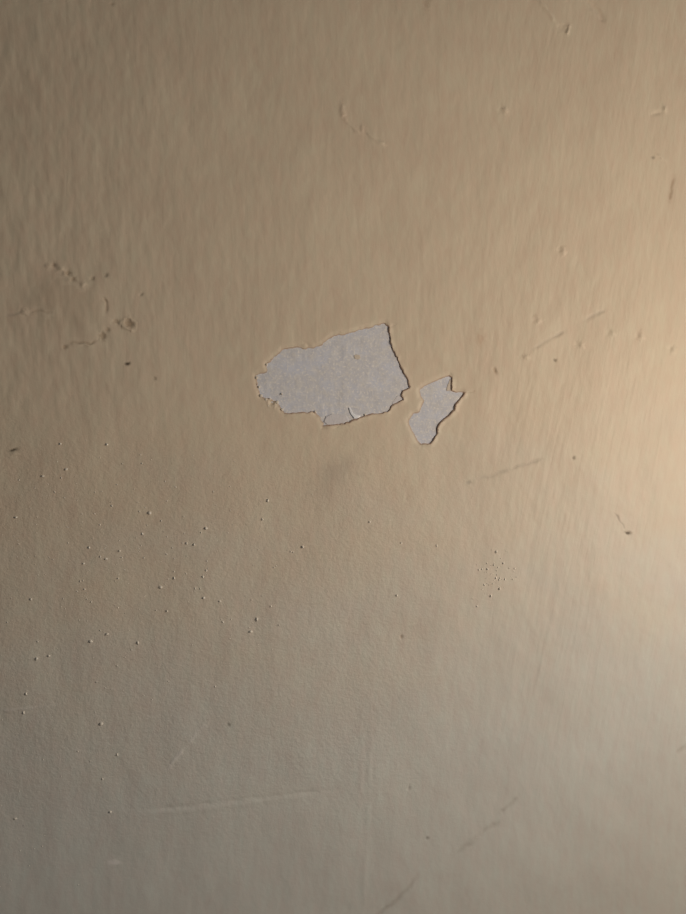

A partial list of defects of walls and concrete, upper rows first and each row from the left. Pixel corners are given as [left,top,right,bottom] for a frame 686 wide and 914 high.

peeling [248,315,477,451]